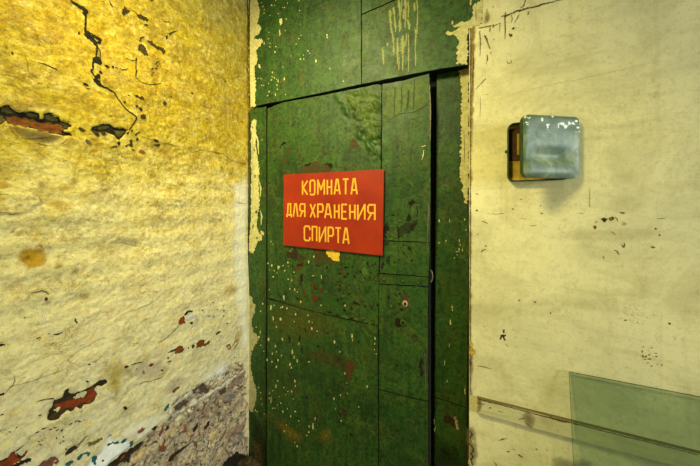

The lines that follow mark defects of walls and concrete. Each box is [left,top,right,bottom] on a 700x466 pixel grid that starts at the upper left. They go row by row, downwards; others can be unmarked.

crack [70,0,137,130]
flaking render [0,105,145,154]
peeling [159,302,228,343]
peeling [124,331,221,386]
spalling [36,357,256,466]
flaking render [0,445,31,466]